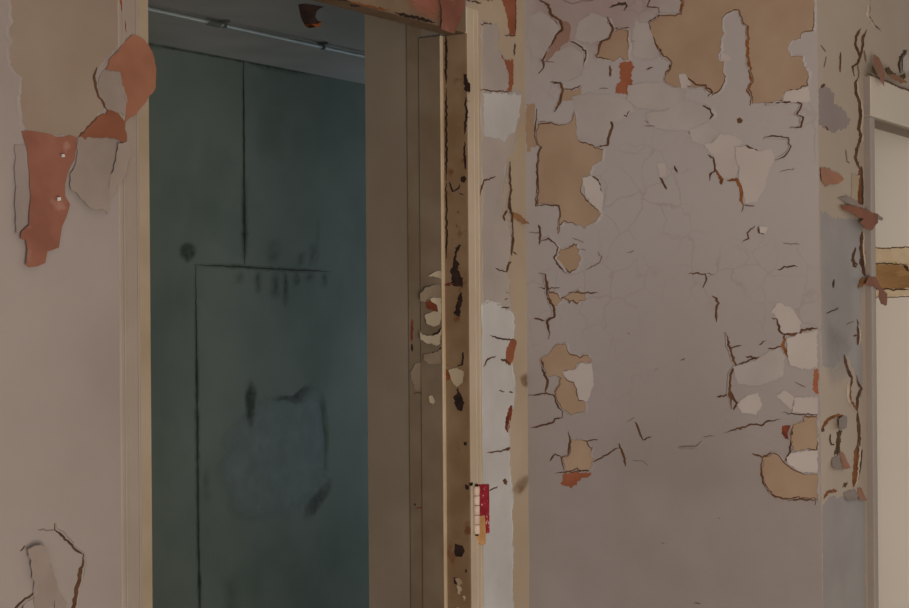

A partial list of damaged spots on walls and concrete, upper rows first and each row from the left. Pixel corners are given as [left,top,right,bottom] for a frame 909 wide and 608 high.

peeling [5,0,128,234]
leakage [237,60,277,240]
peeling [575,13,634,95]
crack [528,0,717,134]
peeling [689,122,775,212]
peeling [648,0,817,106]
peeling [410,284,442,404]
peeling [477,0,614,608]
crack [534,238,602,339]
peeling [812,210,909,399]
leakage [226,390,324,511]
peeling [752,414,866,608]